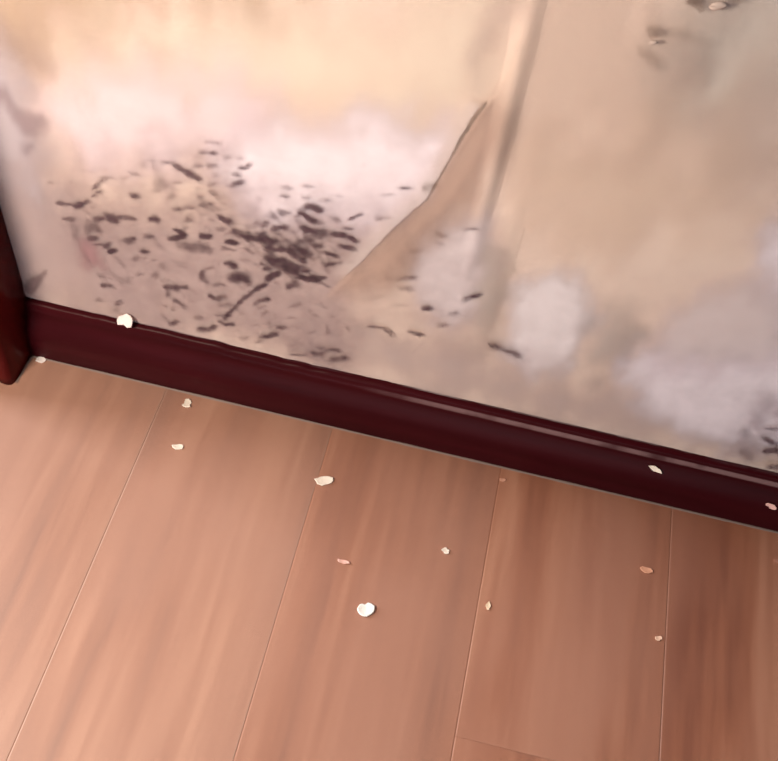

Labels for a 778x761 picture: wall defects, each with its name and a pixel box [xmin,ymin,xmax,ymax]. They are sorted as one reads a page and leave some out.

damp [0,54,360,362]
peeling [340,103,492,288]